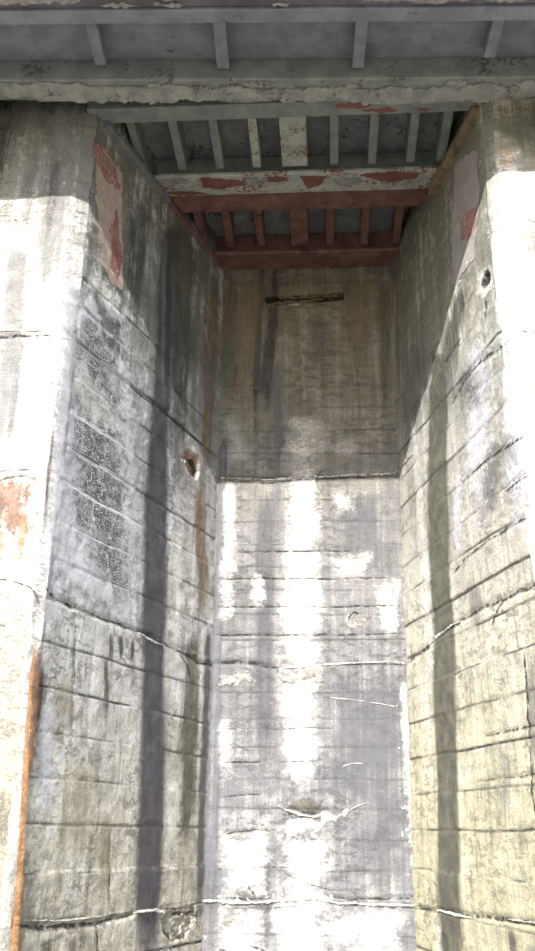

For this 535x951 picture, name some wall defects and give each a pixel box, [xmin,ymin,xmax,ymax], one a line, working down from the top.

leakage [0,100,15,174]
leakage [39,101,82,282]
peeling [157,171,422,196]
leakage [0,252,26,437]
spalling [265,293,344,308]
corrosion [0,480,33,552]
leakage [104,211,527,951]
corrosion [10,647,44,951]